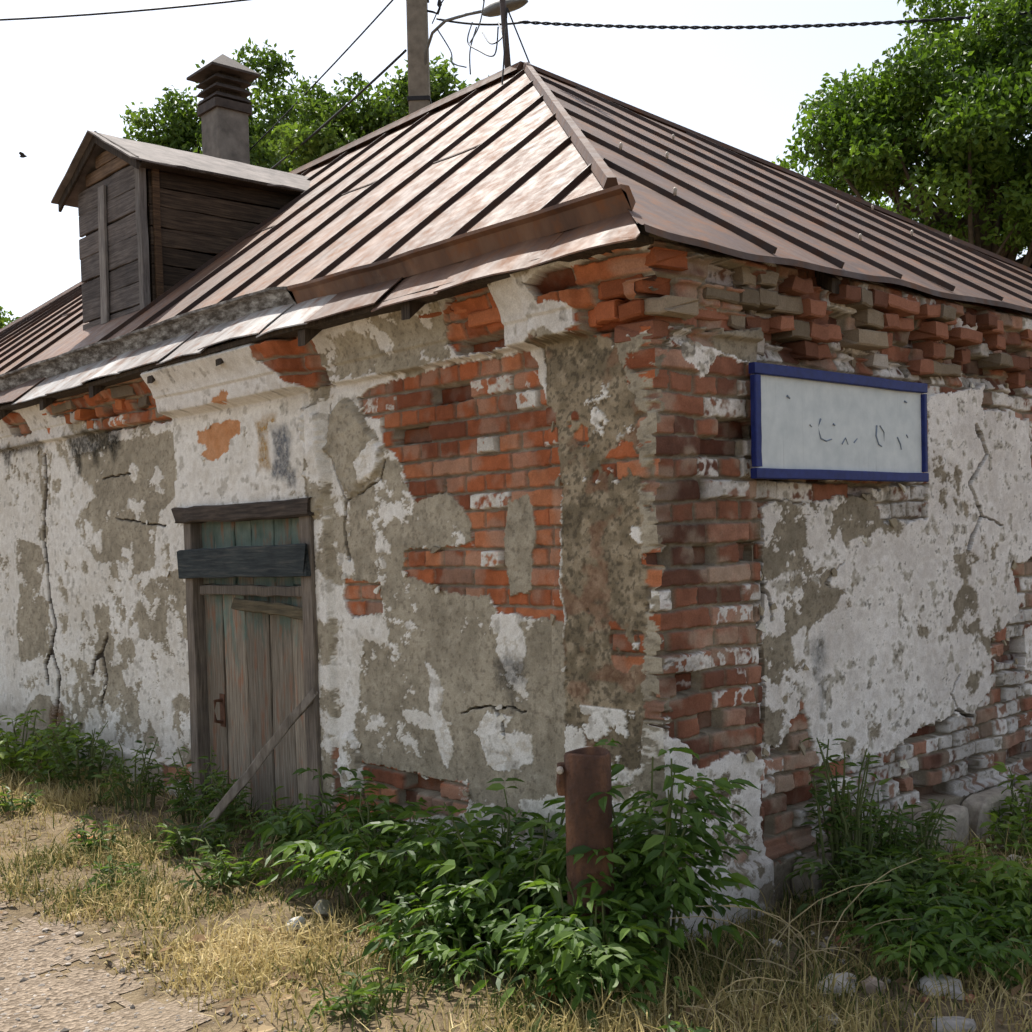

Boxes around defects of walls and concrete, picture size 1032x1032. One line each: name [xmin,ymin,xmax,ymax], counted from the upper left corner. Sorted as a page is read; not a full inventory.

spalling [1,411,32,437]
crack [42,453,61,728]
peeling [12,377,192,786]
peeling [196,418,240,461]
peeling [210,389,228,405]
peeling [330,287,567,822]
spalling [521,224,1032,865]
crack [967,423,1004,551]
crack [90,632,109,706]
crack [464,704,527,734]